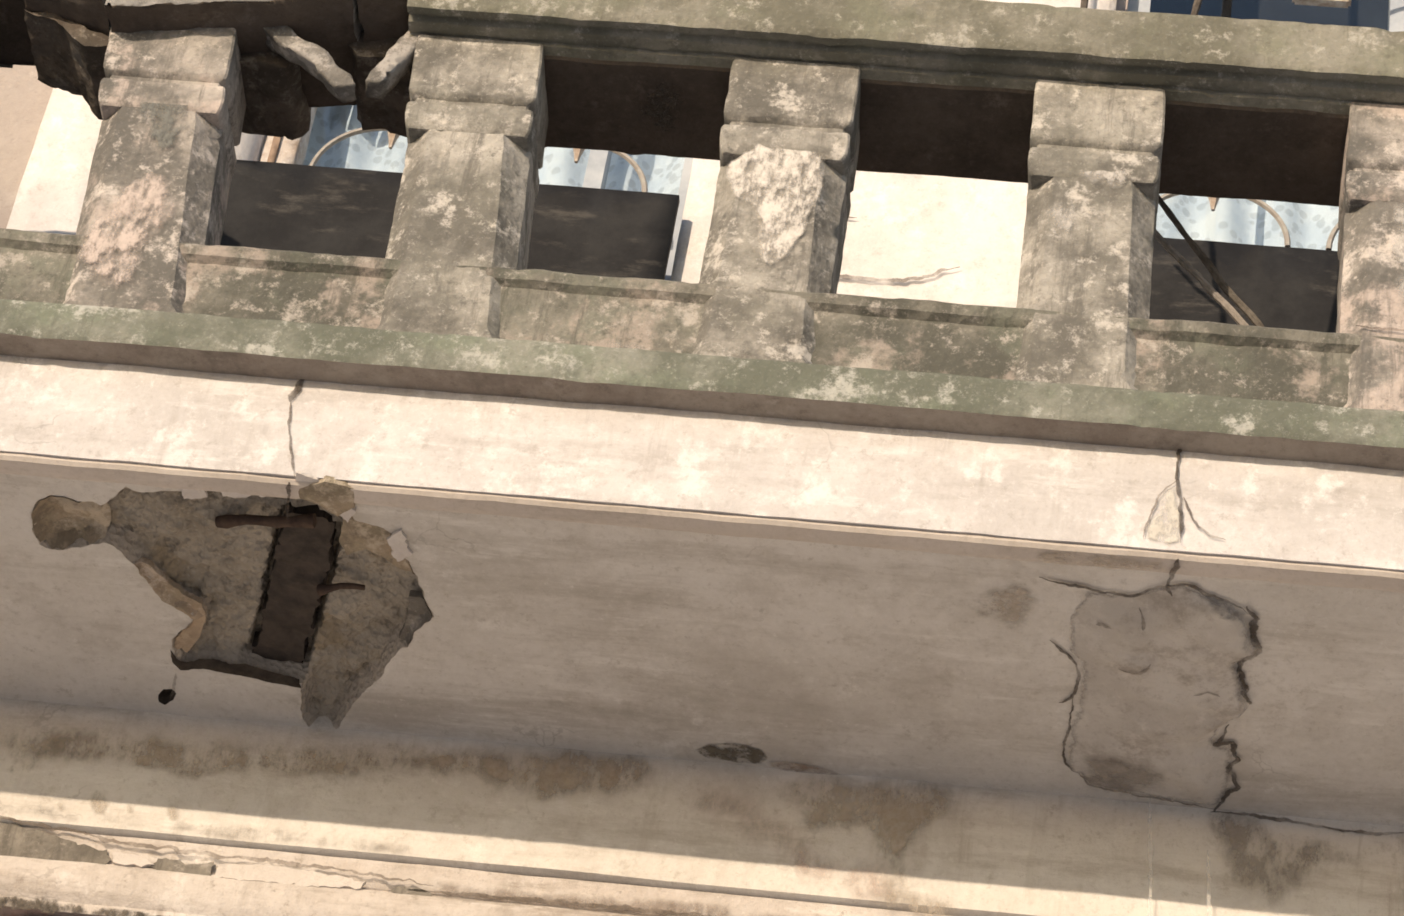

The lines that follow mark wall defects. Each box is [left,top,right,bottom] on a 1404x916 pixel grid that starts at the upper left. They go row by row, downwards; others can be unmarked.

crack [285,379,305,518]
spalling [31,470,434,729]
crack [1040,449,1366,834]
damp [31,738,378,776]
damp [415,751,648,797]
peeling [700,743,820,772]
peeling [0,816,433,896]
damp [1219,815,1323,894]